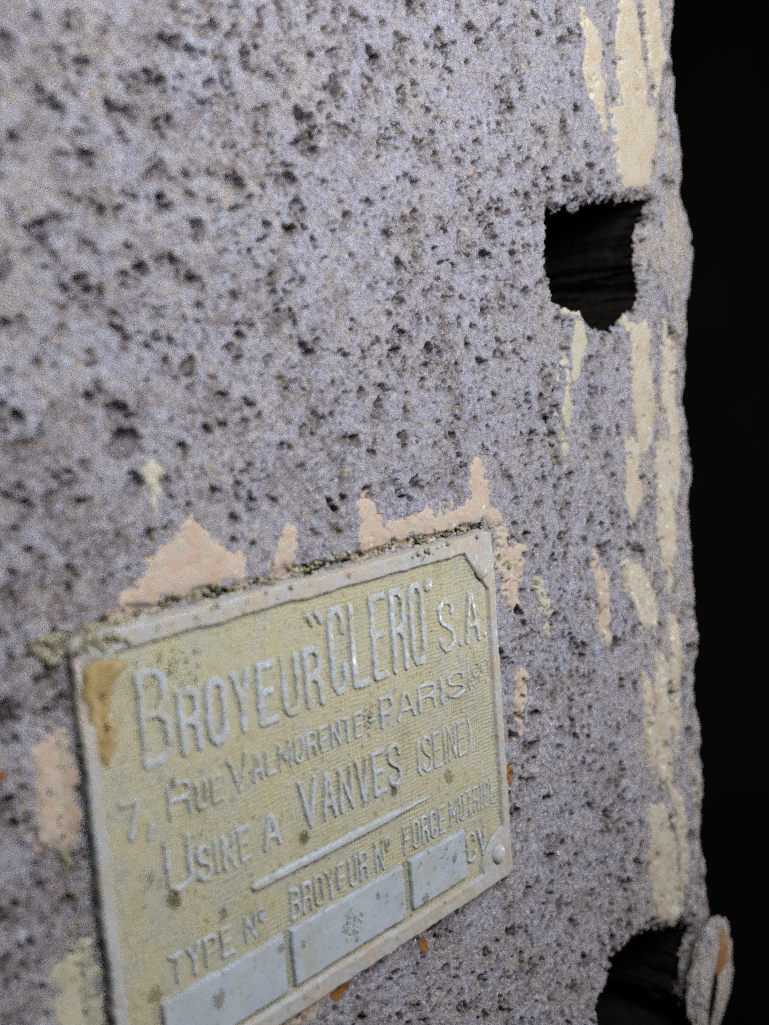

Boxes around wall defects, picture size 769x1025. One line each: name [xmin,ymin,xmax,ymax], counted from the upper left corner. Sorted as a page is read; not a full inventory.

peeling [576,0,667,202]
peeling [100,509,250,623]
peeling [263,522,299,580]
peeling [589,312,689,930]
peeling [283,993,330,1025]